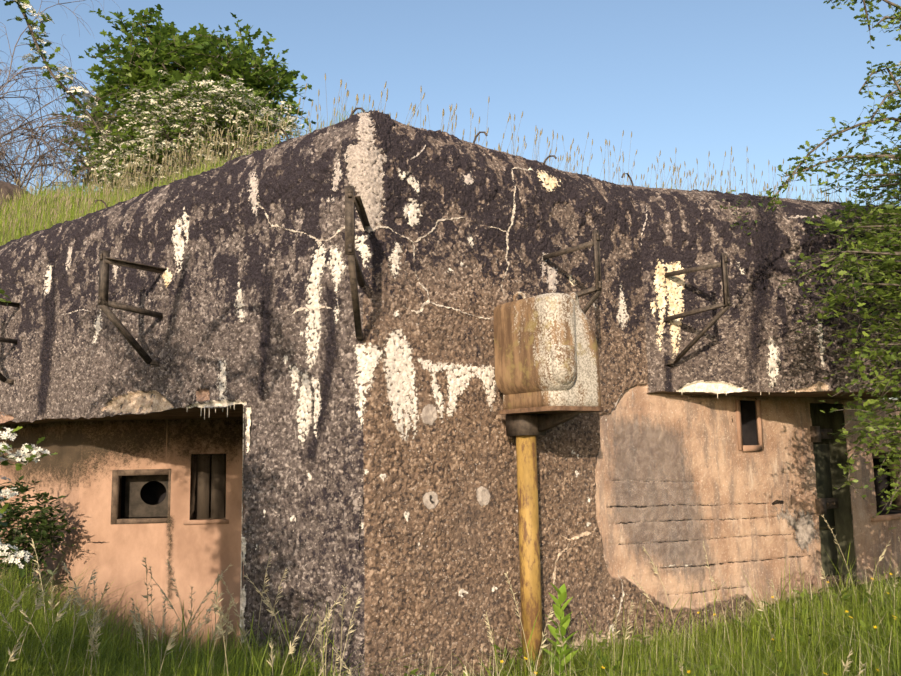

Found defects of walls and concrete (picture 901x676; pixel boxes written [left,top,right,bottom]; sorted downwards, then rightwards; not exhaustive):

crack [259,202,493,319]
crack [490,167,540,296]
spalling [102,390,174,415]
water stain [255,267,273,399]
water stain [283,241,346,481]
efflorescence [353,329,496,443]
water stain [650,259,686,392]
spalling [676,380,748,394]
spalling [785,381,829,392]
spalling [188,388,252,643]
spalling [775,570,819,601]